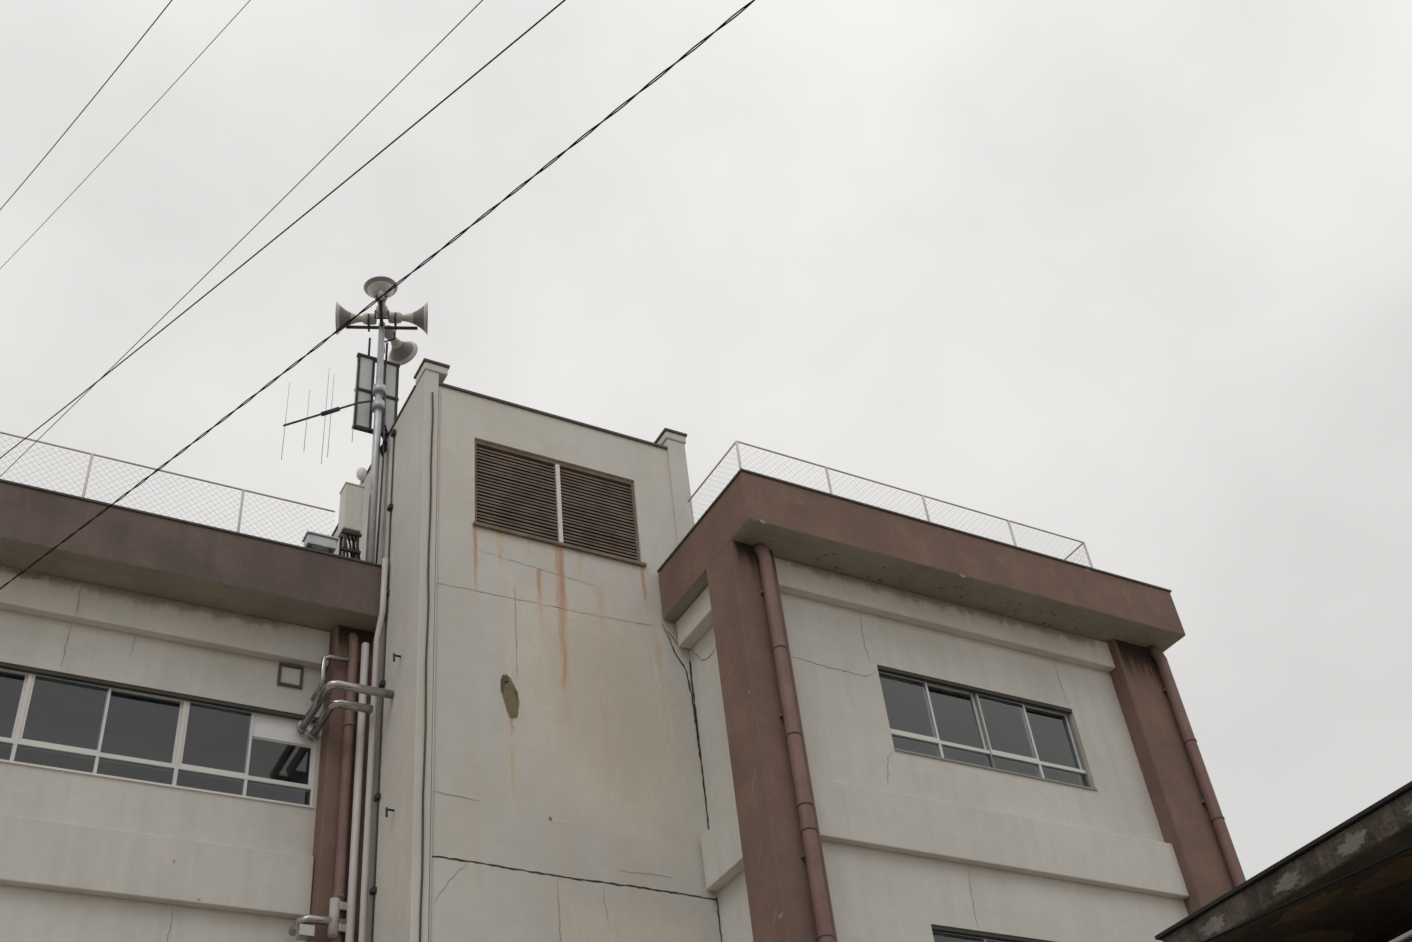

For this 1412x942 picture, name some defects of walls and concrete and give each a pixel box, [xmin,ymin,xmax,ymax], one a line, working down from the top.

corrosion [556,546,566,680]
leakage [1338,830,1365,856]
leakage [1276,872,1299,891]
leakage [1203,916,1224,936]